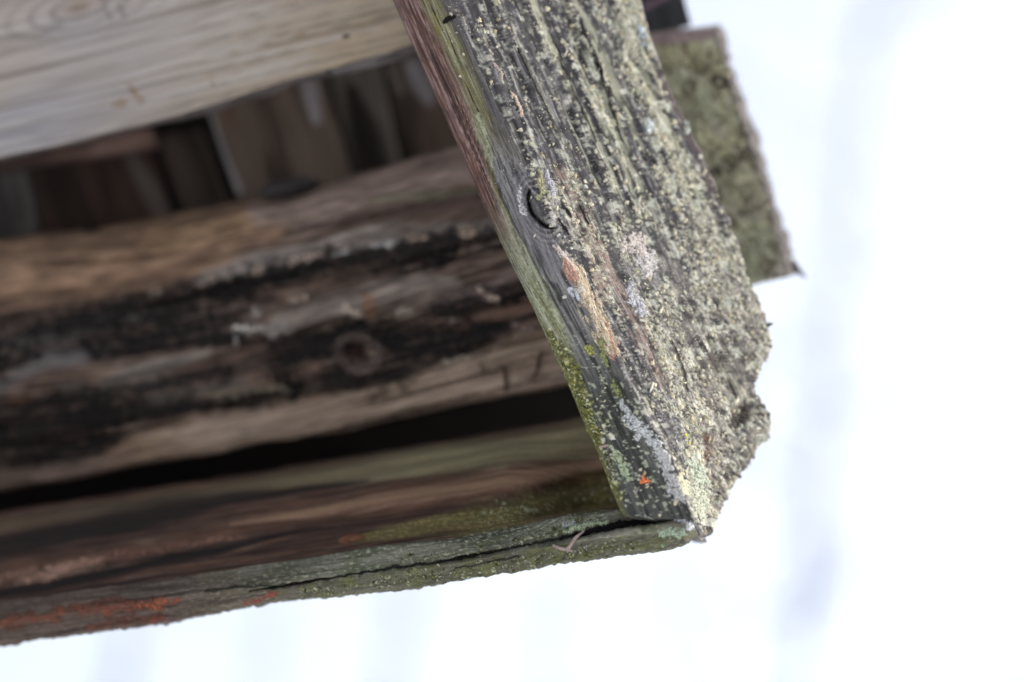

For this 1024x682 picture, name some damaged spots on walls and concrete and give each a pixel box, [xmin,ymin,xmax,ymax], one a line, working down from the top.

crack [205,519,674,592]
corrosion [0,597,181,633]